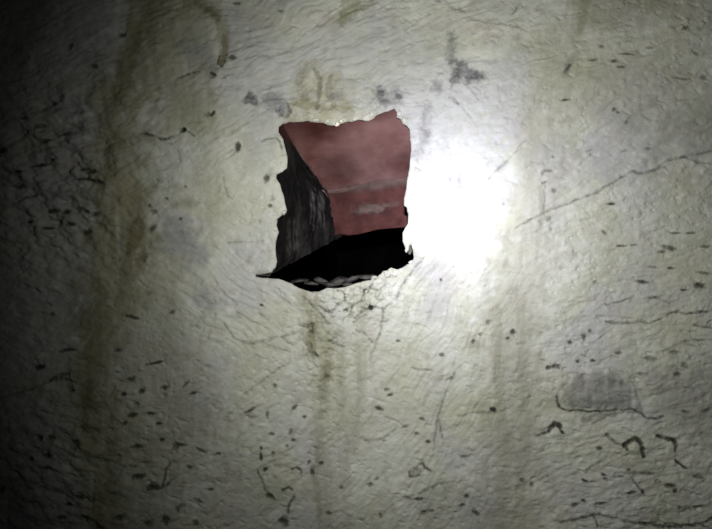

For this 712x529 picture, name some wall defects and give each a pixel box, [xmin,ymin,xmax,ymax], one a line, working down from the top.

flaking render [306,110,374,126]
spalling [260,125,414,303]